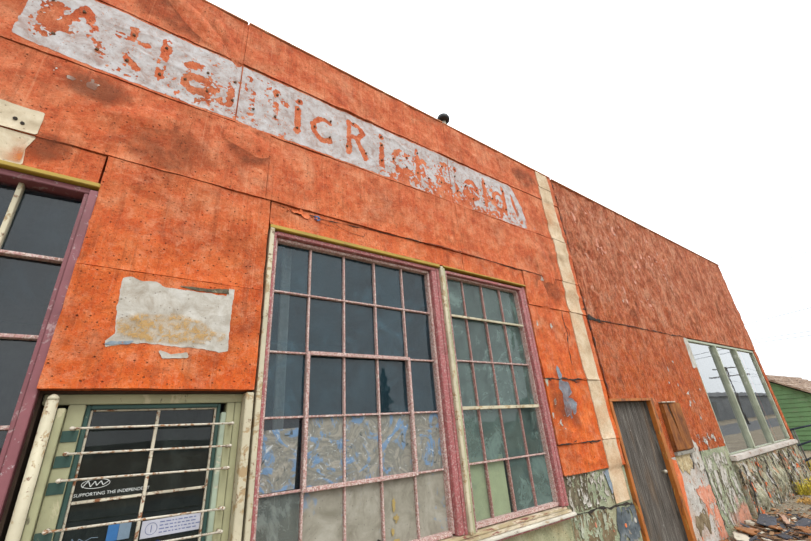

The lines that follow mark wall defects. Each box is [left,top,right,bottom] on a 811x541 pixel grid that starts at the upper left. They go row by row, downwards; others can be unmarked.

peeling [0,99,45,164]
peeling [105,277,235,359]
peeling [552,366,577,429]
flaking render [563,469,641,541]
peeling [672,434,810,541]